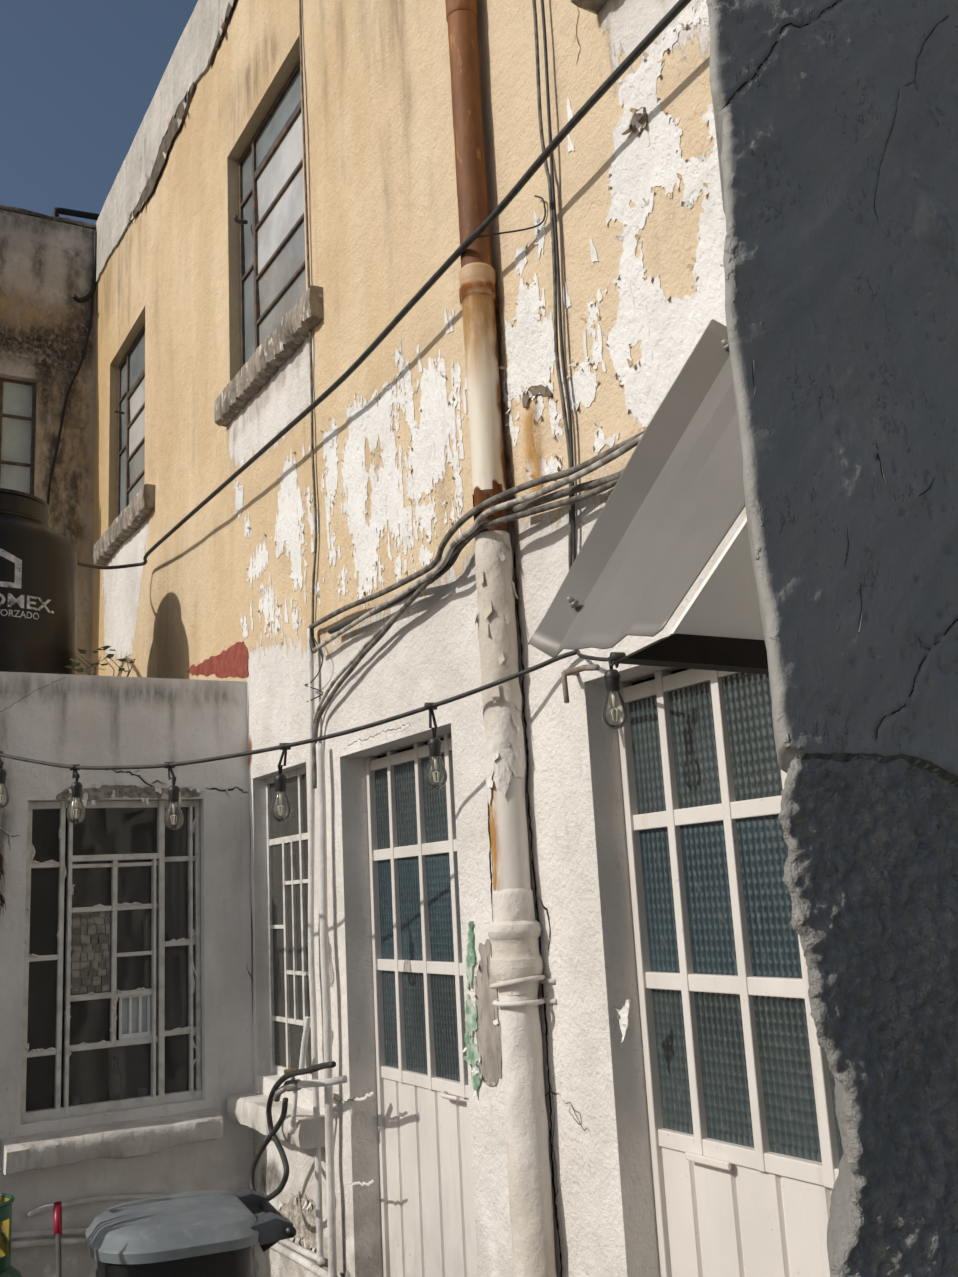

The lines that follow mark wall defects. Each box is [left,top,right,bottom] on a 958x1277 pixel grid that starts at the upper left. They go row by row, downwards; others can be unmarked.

crack [721,0,842,110]
crack [874,15,949,224]
peeling [500,0,727,485]
leakage [0,307,93,536]
peeling [234,307,527,806]
crack [876,619,958,741]
spalling [462,921,502,1097]